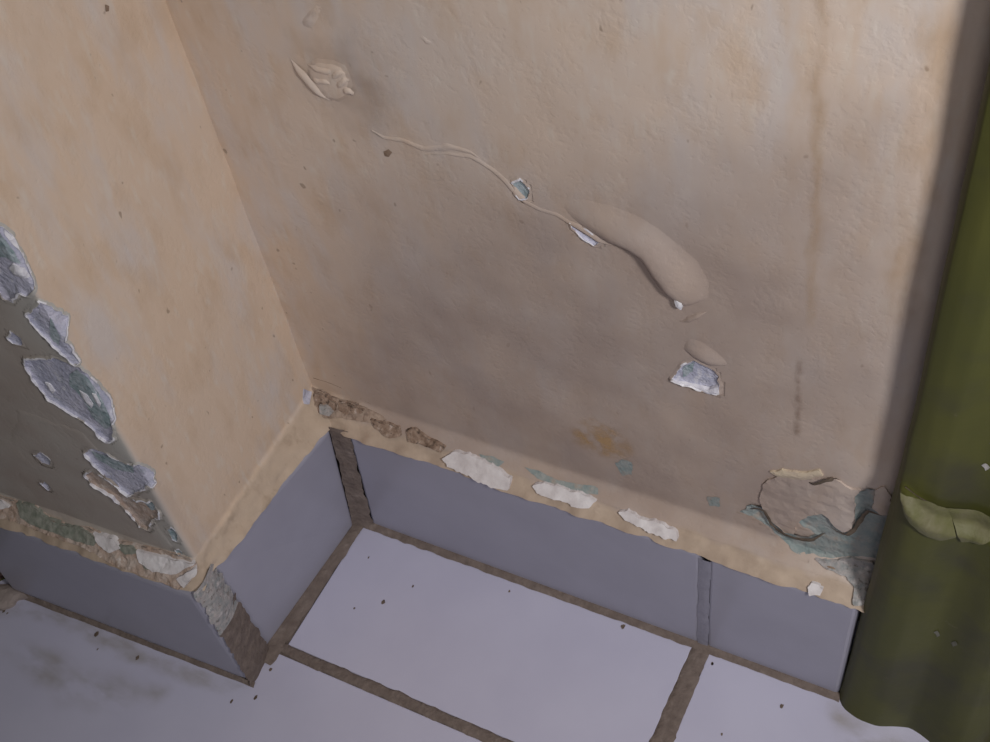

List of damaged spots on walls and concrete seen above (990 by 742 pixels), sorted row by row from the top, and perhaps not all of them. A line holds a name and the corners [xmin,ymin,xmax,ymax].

crack [371,130,629,252]
flaking render [0,222,199,590]
flaking render [303,386,446,453]
peeling [668,339,727,396]
flaking render [740,468,892,606]